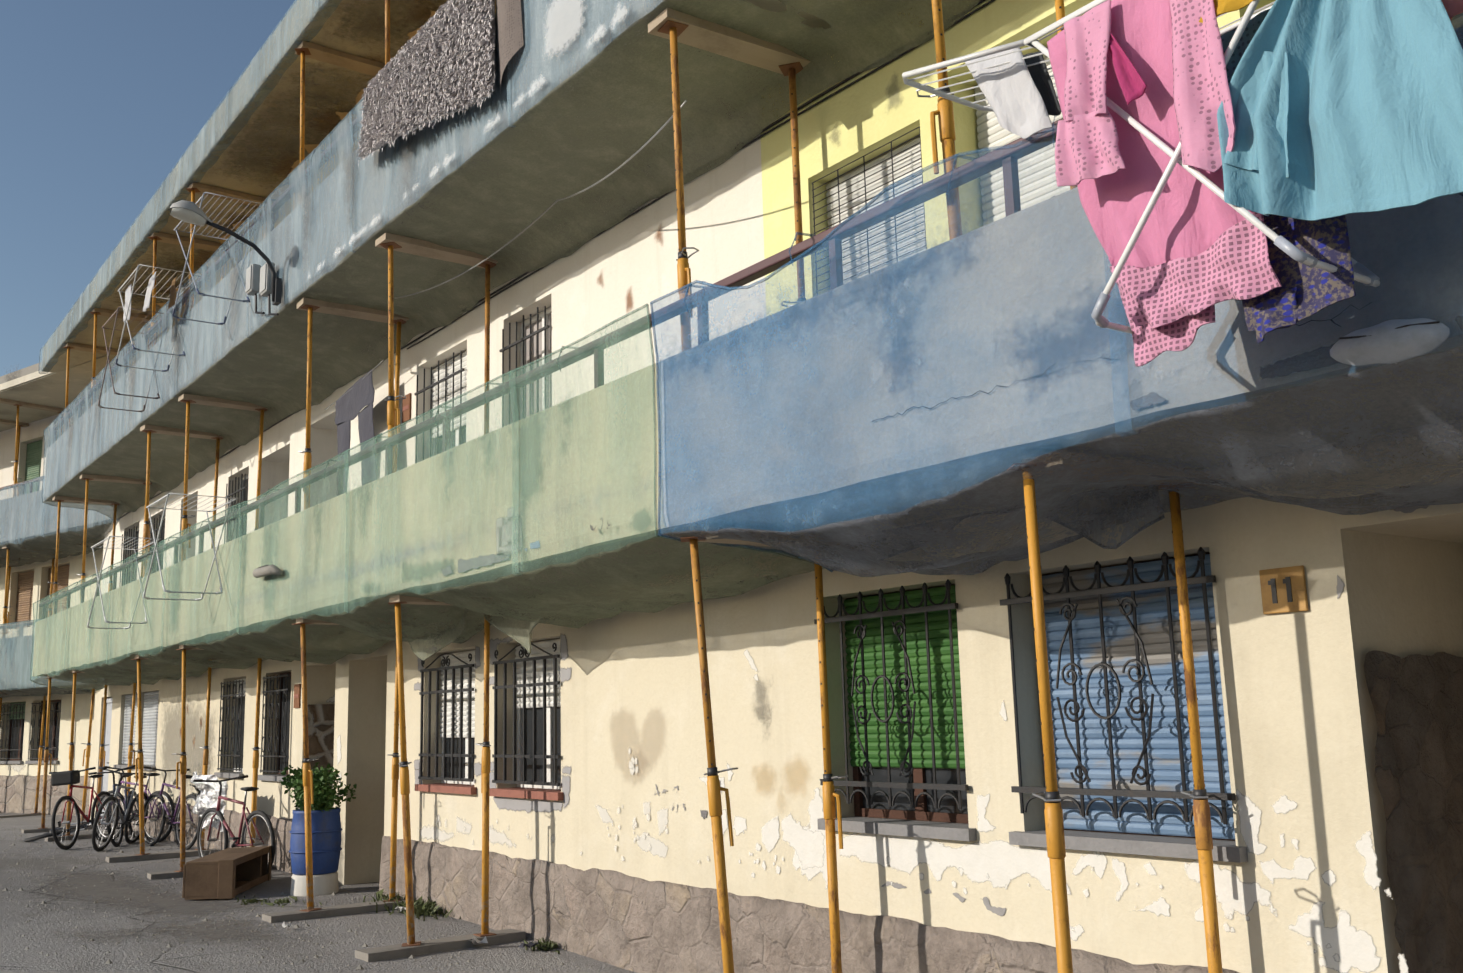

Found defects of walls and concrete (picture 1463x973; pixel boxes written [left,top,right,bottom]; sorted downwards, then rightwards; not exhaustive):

peeling [699,764,733,788]
peeling [420,816,529,847]
peeling [698,788,1170,917]
peeling [1356,831,1391,897]
peeling [1184,790,1380,973]
peeling [1070,925,1084,941]
peeling [1398,954,1408,973]